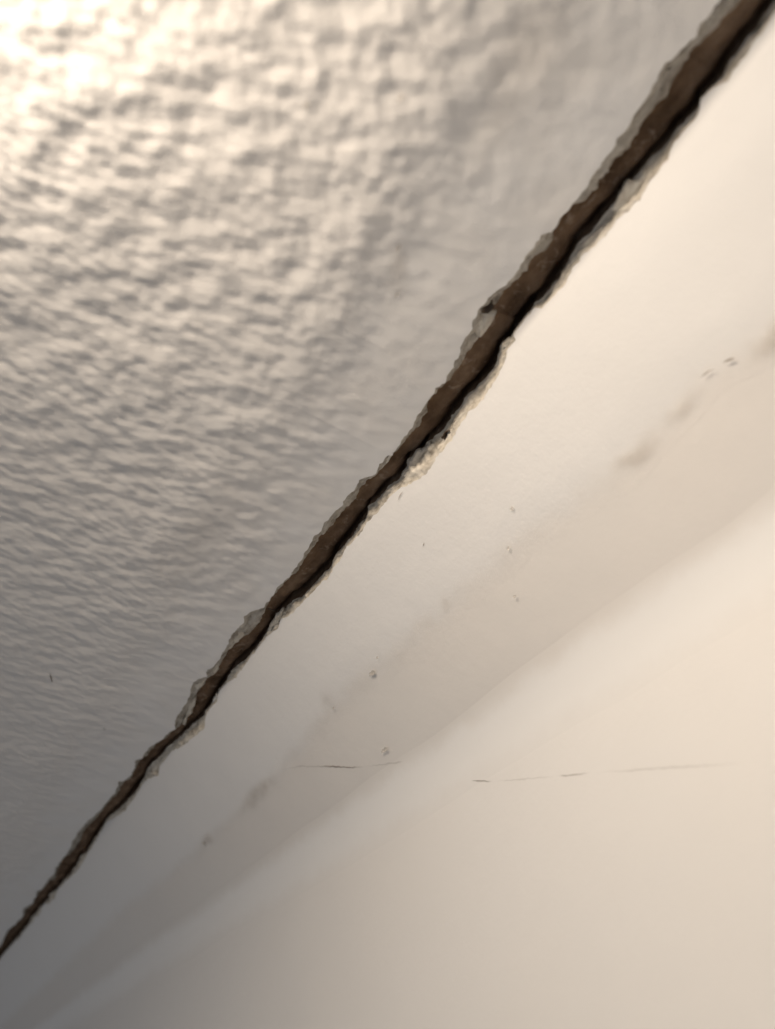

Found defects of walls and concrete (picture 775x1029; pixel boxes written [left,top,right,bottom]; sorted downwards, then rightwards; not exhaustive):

crack [571,0,740,206]
crack [700,1,775,101]
crack [269,102,700,631]
crack [175,609,260,729]
crack [213,621,280,702]
crack [248,601,270,628]
crack [36,759,141,895]
crack [59,710,209,888]
crack [0,889,58,958]